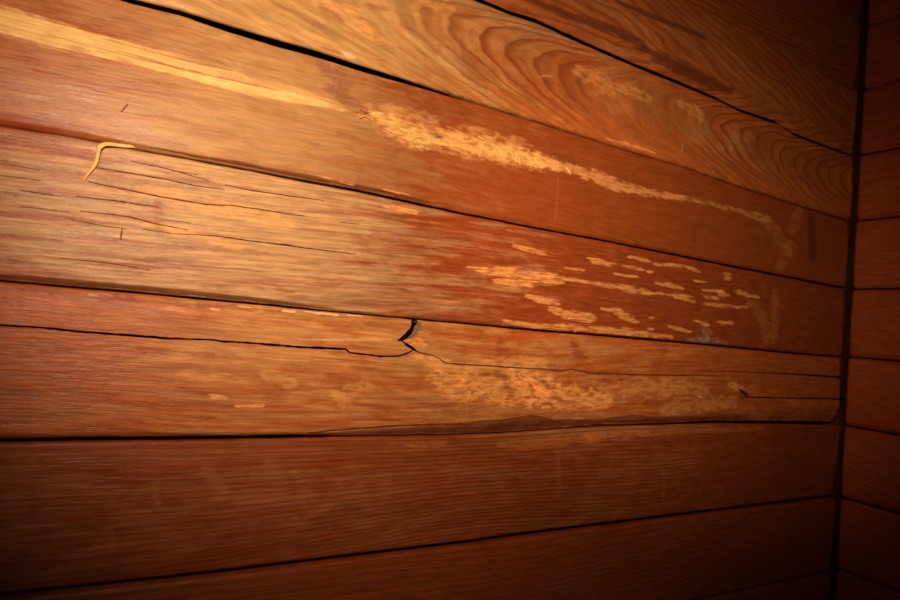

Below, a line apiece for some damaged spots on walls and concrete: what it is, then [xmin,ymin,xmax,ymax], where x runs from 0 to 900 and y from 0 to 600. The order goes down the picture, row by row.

crack [0,319,845,400]